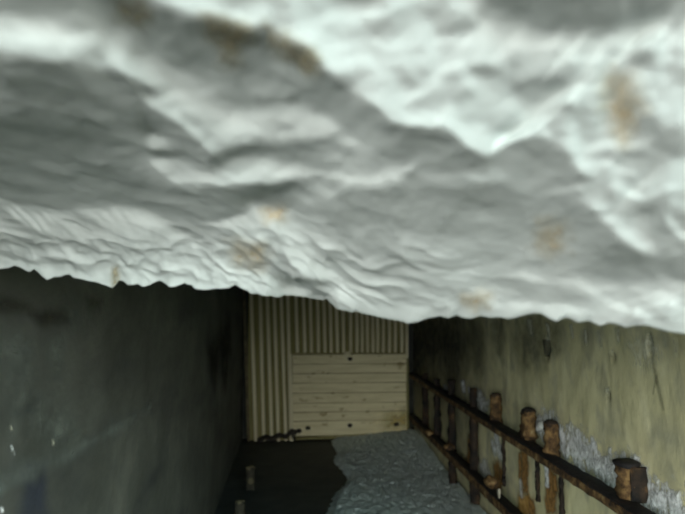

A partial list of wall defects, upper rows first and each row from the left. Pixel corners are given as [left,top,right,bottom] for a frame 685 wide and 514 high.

rust [208,22,244,53]
efflorescence [536,408,645,488]
efflorescence [641,478,685,514]